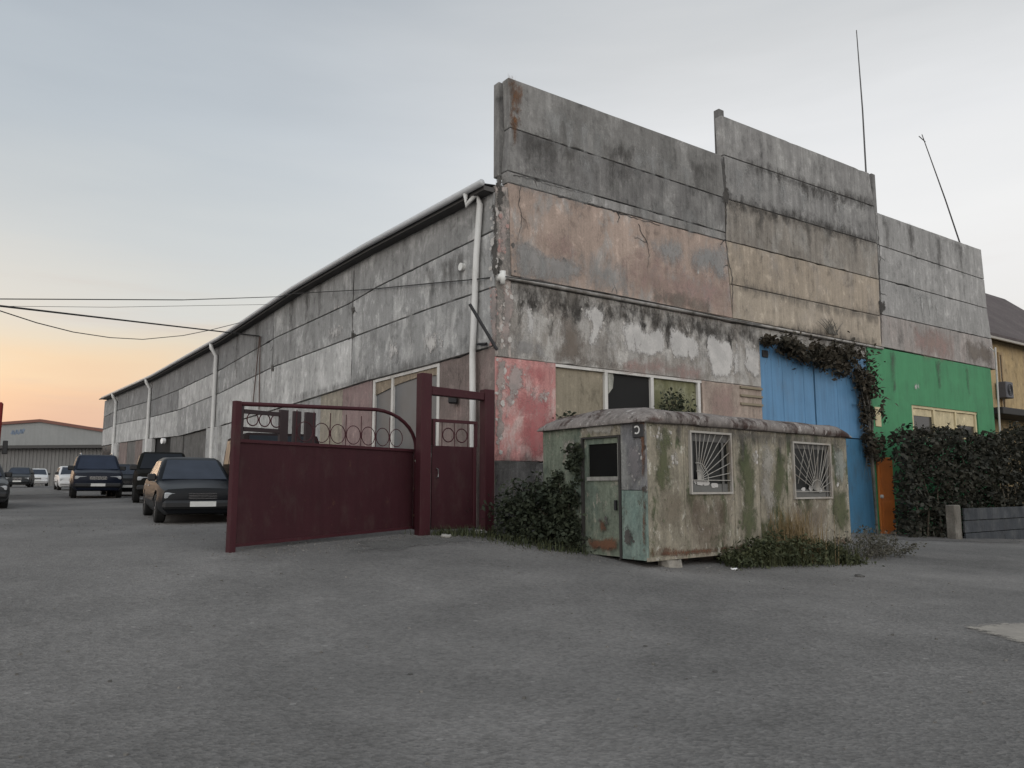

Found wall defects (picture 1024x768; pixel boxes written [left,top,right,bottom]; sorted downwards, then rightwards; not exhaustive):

crack [513,175,659,268]
crack [717,157,733,308]
peeling [488,175,550,482]
water stain [519,287,753,350]
corrosion [588,485,748,557]